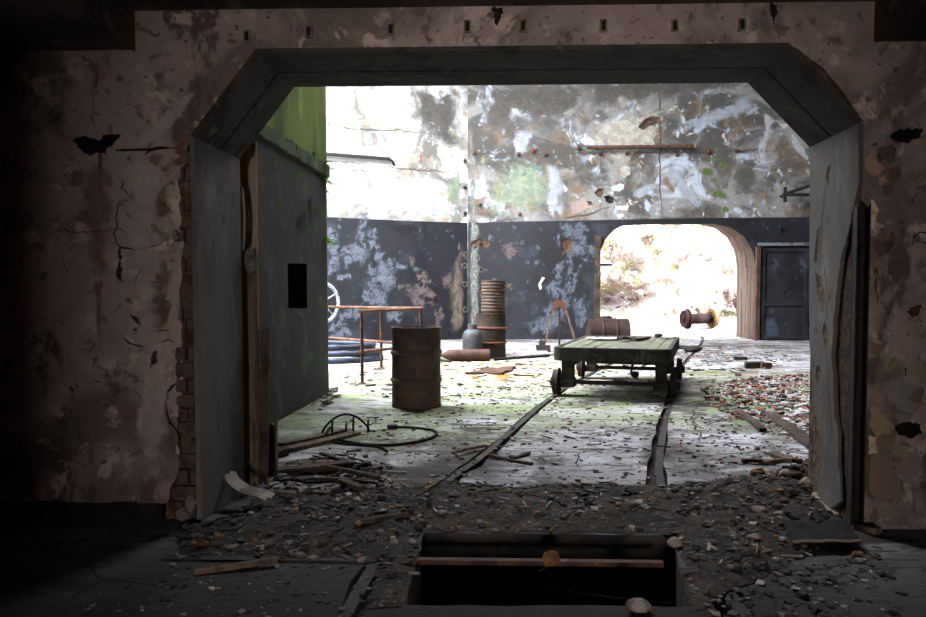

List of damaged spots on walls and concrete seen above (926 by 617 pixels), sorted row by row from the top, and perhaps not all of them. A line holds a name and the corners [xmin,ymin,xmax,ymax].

spalling [73,133,121,169]
crack [50,178,175,283]